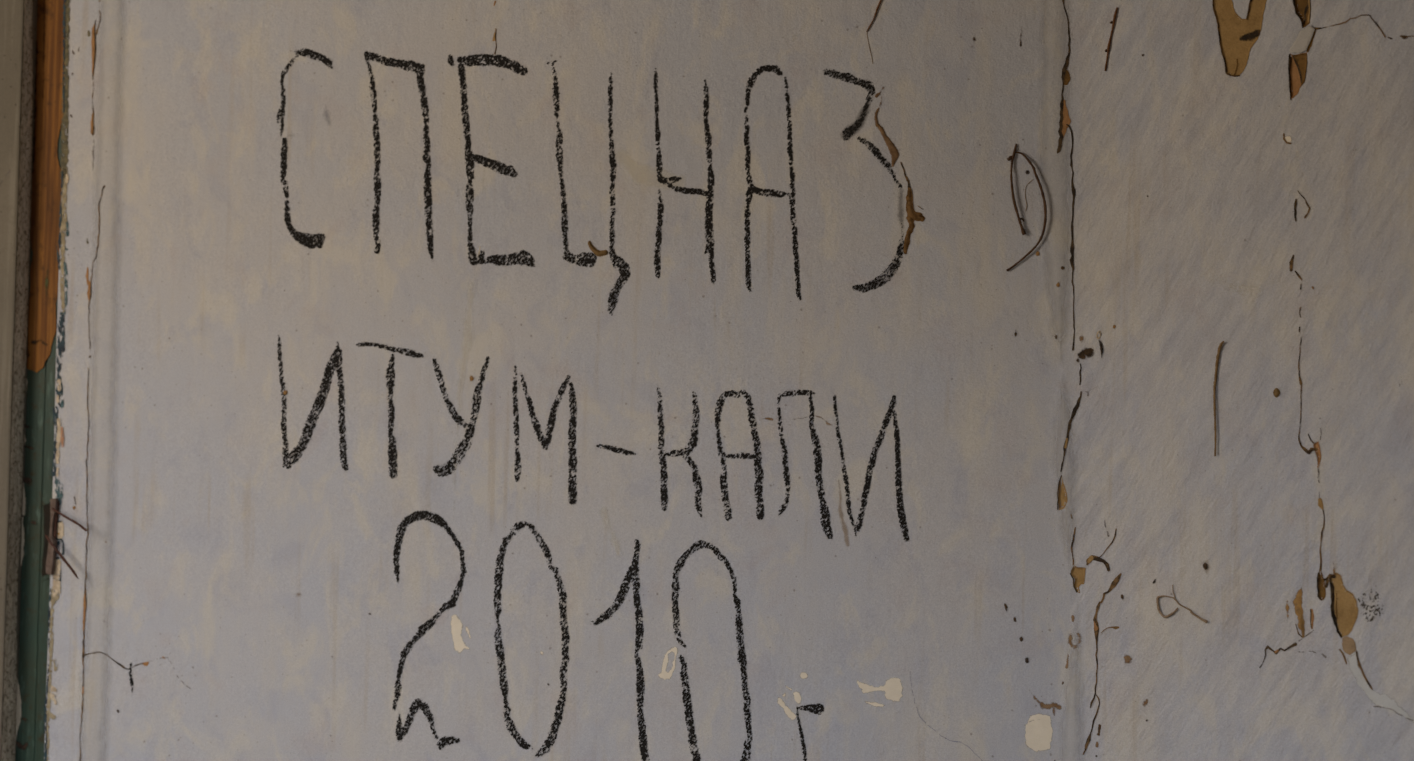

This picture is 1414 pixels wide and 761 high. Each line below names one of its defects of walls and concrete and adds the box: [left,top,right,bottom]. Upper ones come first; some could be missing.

peeling [1212,0,1267,77]
peeling [1293,0,1311,28]
crack [1306,14,1414,52]
peeling [1288,52,1307,100]
crack [1294,190,1310,221]
crack [1057,0,1121,755]
crack [1259,255,1329,668]
peeling [1326,569,1414,723]
peeling [857,677,903,707]
peeling [1025,714,1053,752]